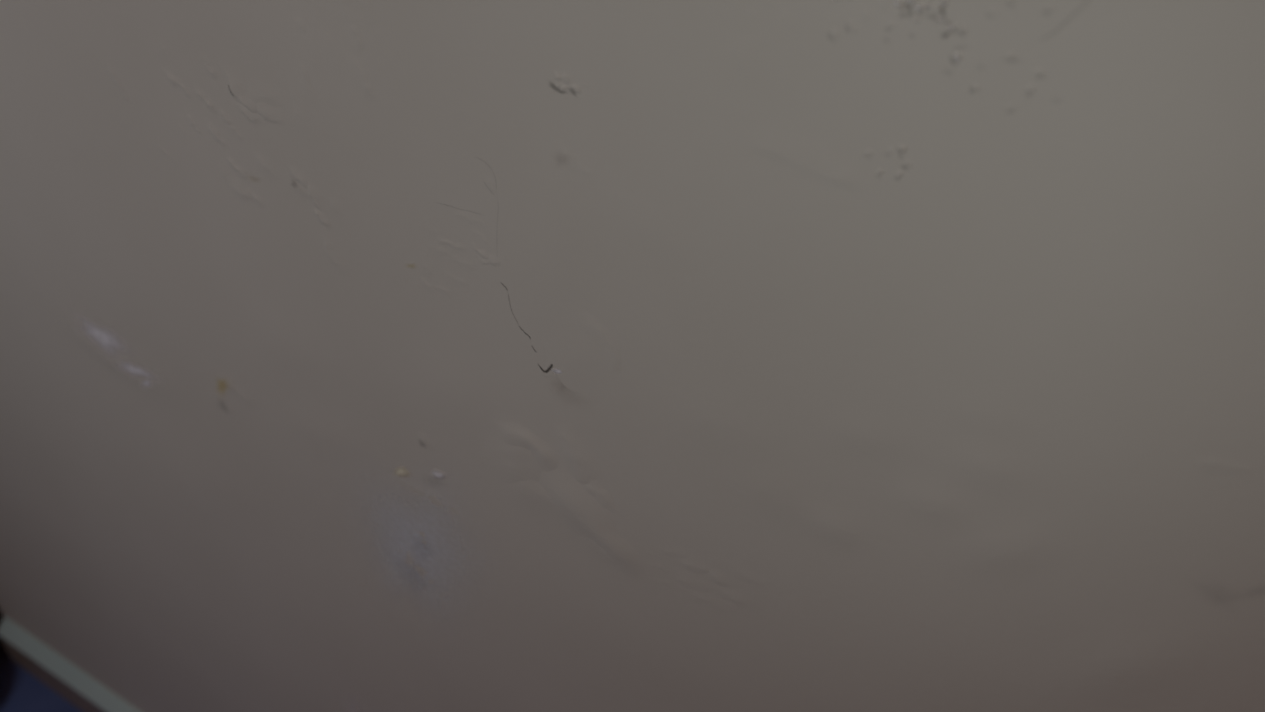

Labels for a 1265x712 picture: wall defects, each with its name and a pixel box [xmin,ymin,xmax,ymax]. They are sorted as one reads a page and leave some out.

crack [537,365,554,379]